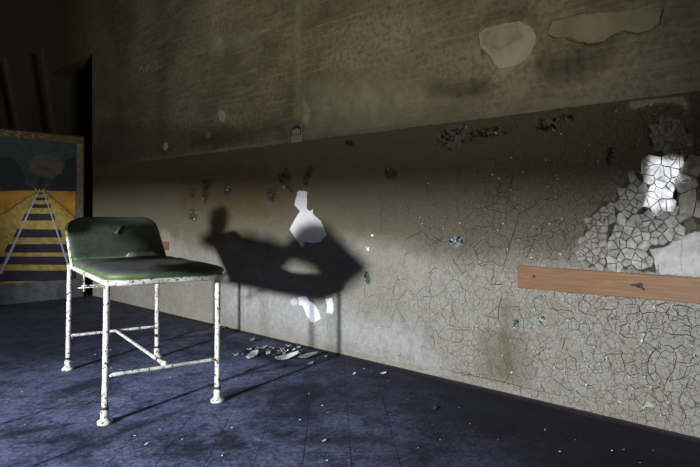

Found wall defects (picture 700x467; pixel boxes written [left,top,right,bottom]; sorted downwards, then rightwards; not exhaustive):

spalling [479,21,536,69]
spalling [546,8,664,46]
peeling [266,167,327,248]
peeling [576,114,700,277]
crack [356,99,700,426]
peeling [290,296,334,324]